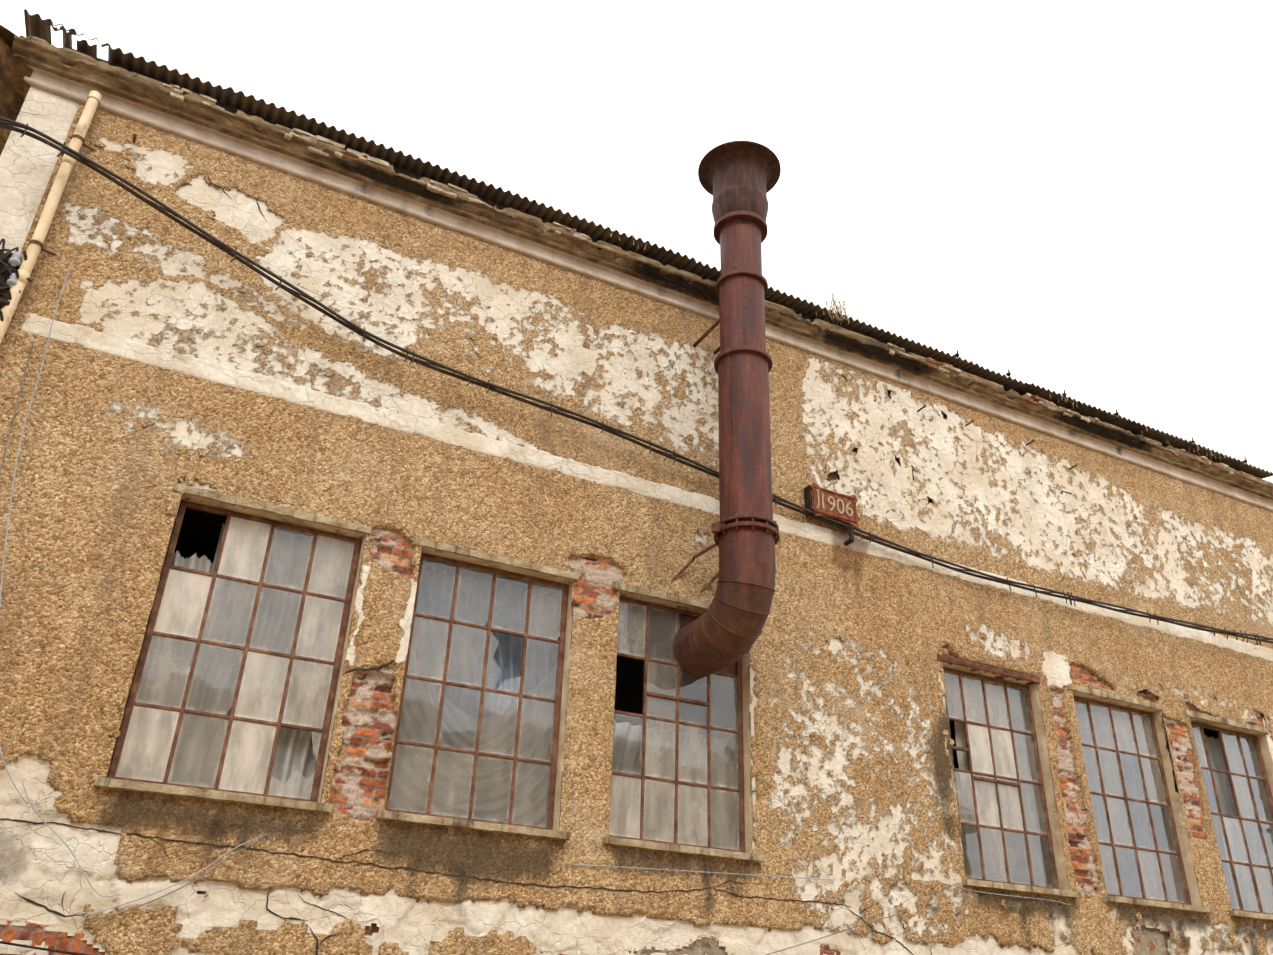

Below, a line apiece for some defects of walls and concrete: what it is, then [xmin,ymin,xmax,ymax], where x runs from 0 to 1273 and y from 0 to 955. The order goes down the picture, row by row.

flaking render [76,396,420,829]
peeling [60,124,720,470]
flaking render [563,549,636,625]
peeling [686,523,714,554]
spalling [886,342,961,374]
peeling [796,355,1273,630]
peeling [0,615,1273,955]